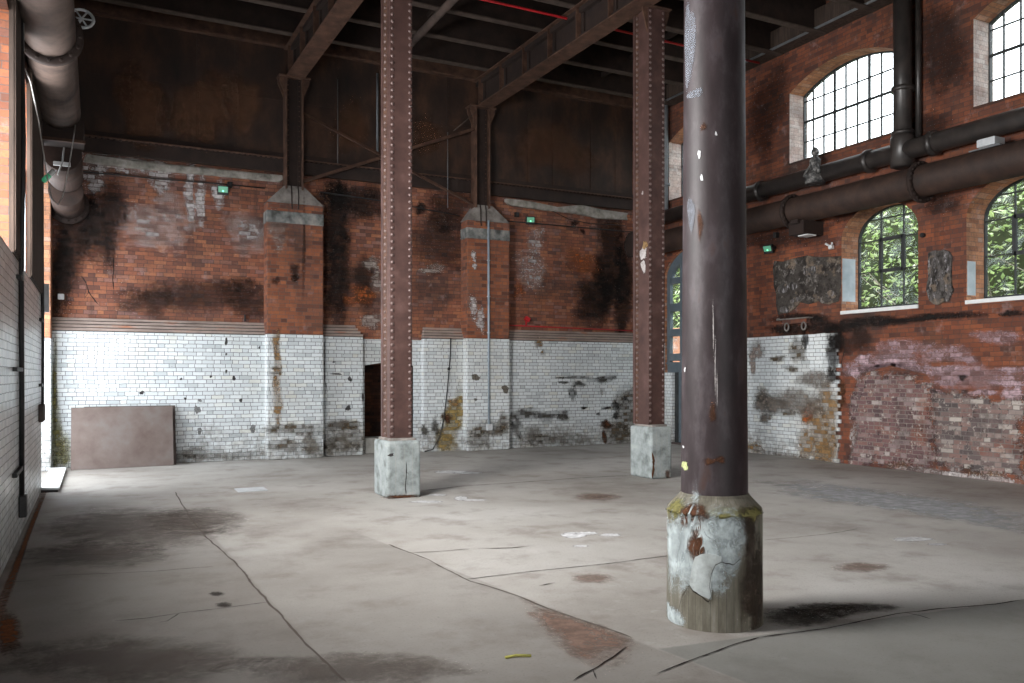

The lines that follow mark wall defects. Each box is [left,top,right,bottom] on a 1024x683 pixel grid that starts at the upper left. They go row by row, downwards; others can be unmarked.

damp [52,153,171,317]
damp [183,164,222,226]
damp [577,247,646,333]
corrosion [272,330,283,424]
damp [421,396,569,450]
damp [556,376,633,444]
damp [748,317,980,462]
spalling [848,369,1024,481]
damp [966,367,1024,401]
corrosion [679,503,708,560]
crack [117,492,347,682]
peeling [689,554,722,600]